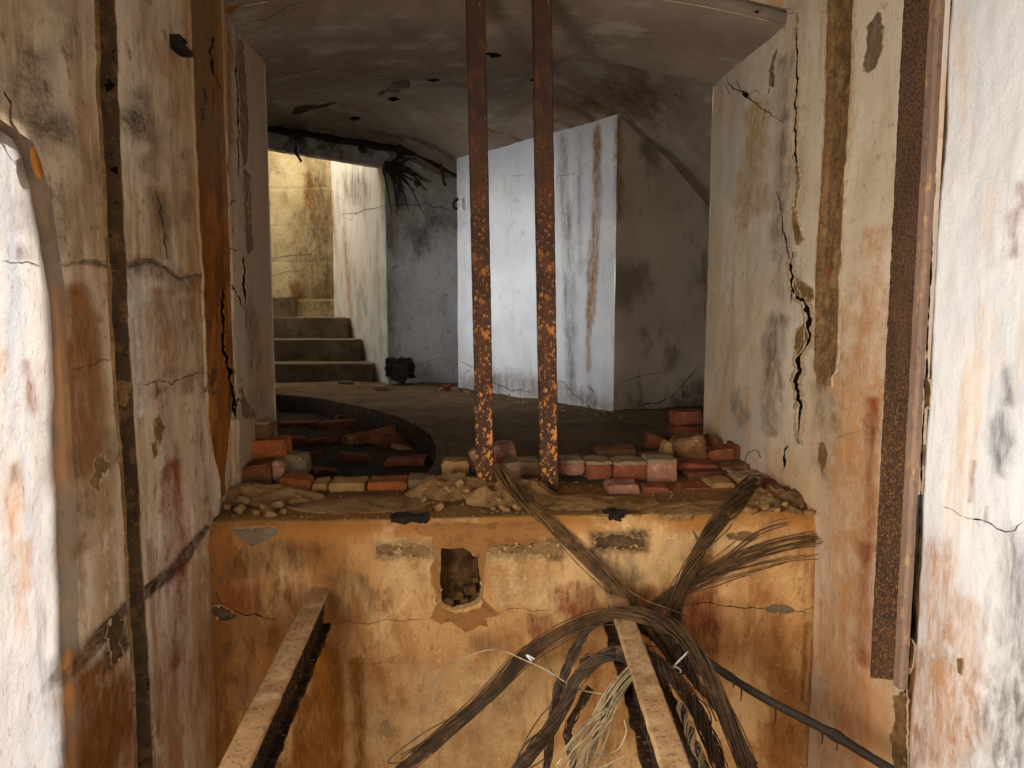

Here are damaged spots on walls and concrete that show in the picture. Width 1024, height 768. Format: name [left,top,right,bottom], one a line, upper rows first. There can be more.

crack [8,191,248,421]
rust [555,98,622,340]
crack [724,0,815,470]
spalling [790,0,885,387]
flaking render [375,520,562,632]
flaking render [594,532,645,551]
crack [684,601,763,609]
crack [912,229,1024,643]